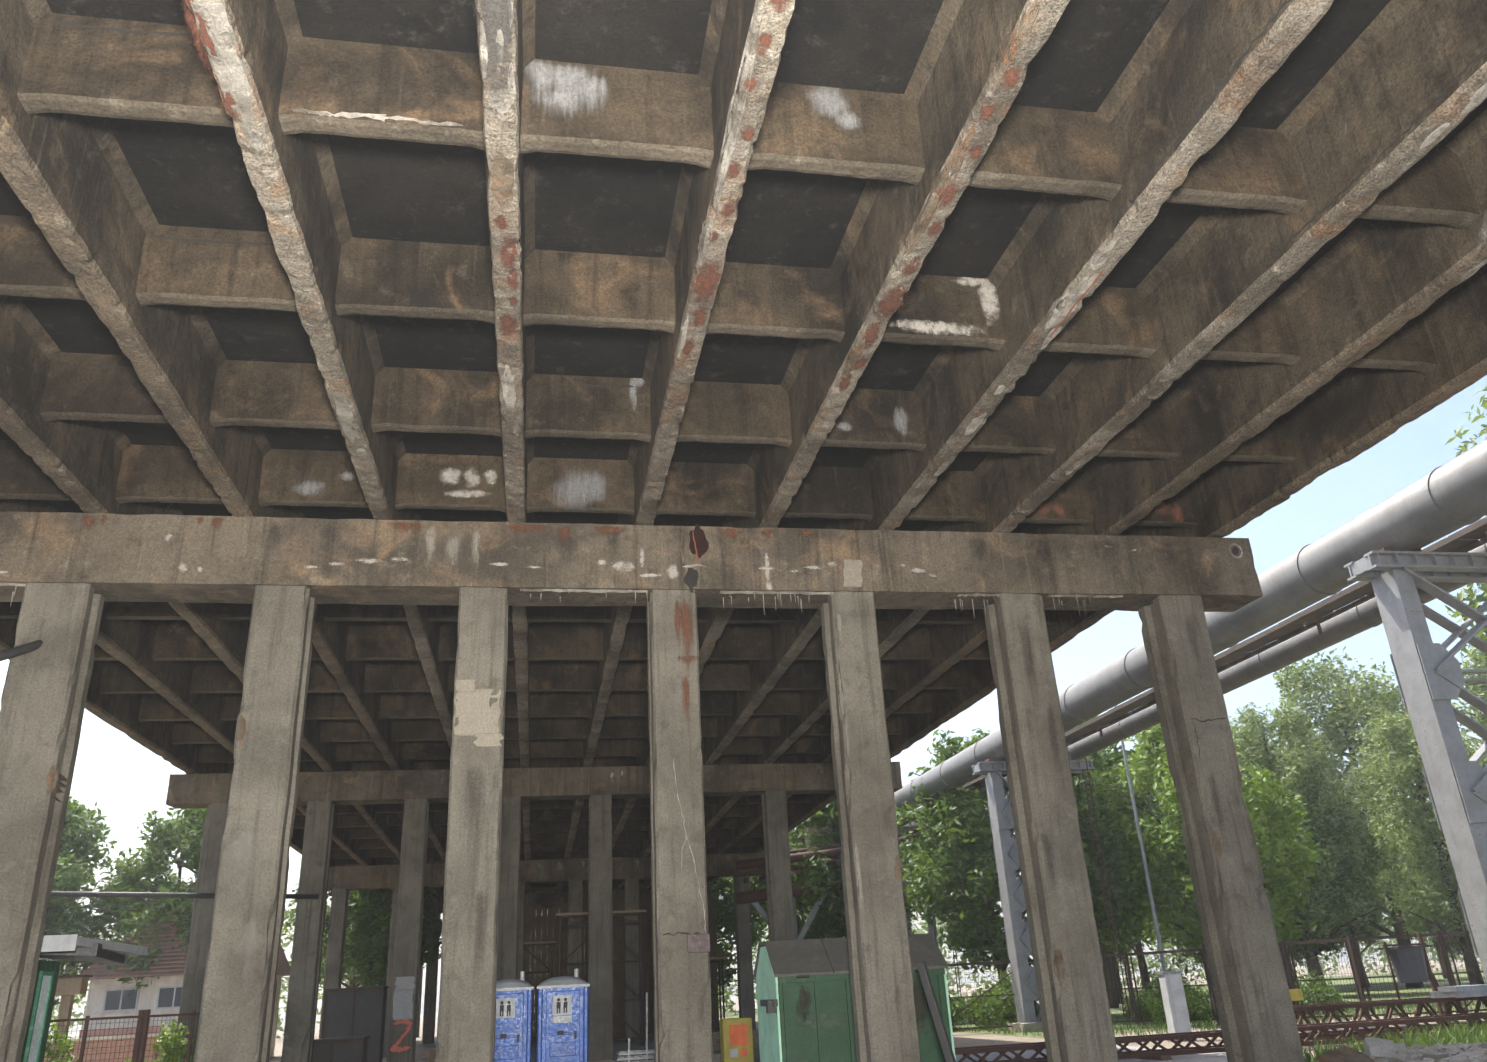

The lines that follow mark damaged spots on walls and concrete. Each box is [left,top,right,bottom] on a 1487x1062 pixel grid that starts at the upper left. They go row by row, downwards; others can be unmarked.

rust [757,33,772,54]
damp [530,62,606,111]
rust [728,162,740,177]
rust [496,215,518,336]
rust [683,263,722,355]
rust [840,257,920,390]
damp [898,321,970,335]
damp [957,277,998,318]
spalling [640,524,713,593]
rust [675,602,695,709]
peeling [455,679,475,692]
peeling [473,733,504,747]